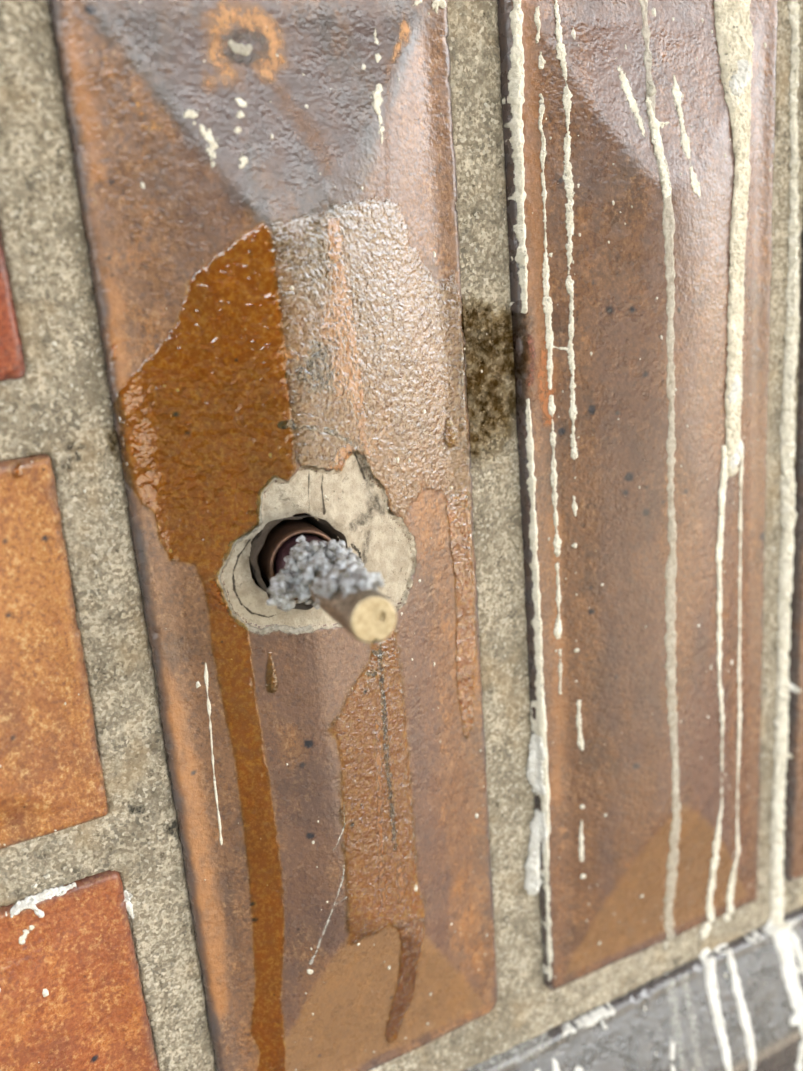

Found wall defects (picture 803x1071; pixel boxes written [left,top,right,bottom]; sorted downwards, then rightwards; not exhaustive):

corrosion [206,5,286,86]
spalling [216,450,417,634]
corrosion [320,218,370,471]
water stain [462,309,553,981]
water stain [502,0,528,314]
water stain [639,0,681,950]
water stain [714,0,754,477]
water stain [766,0,803,1071]
water stain [699,943,756,1071]